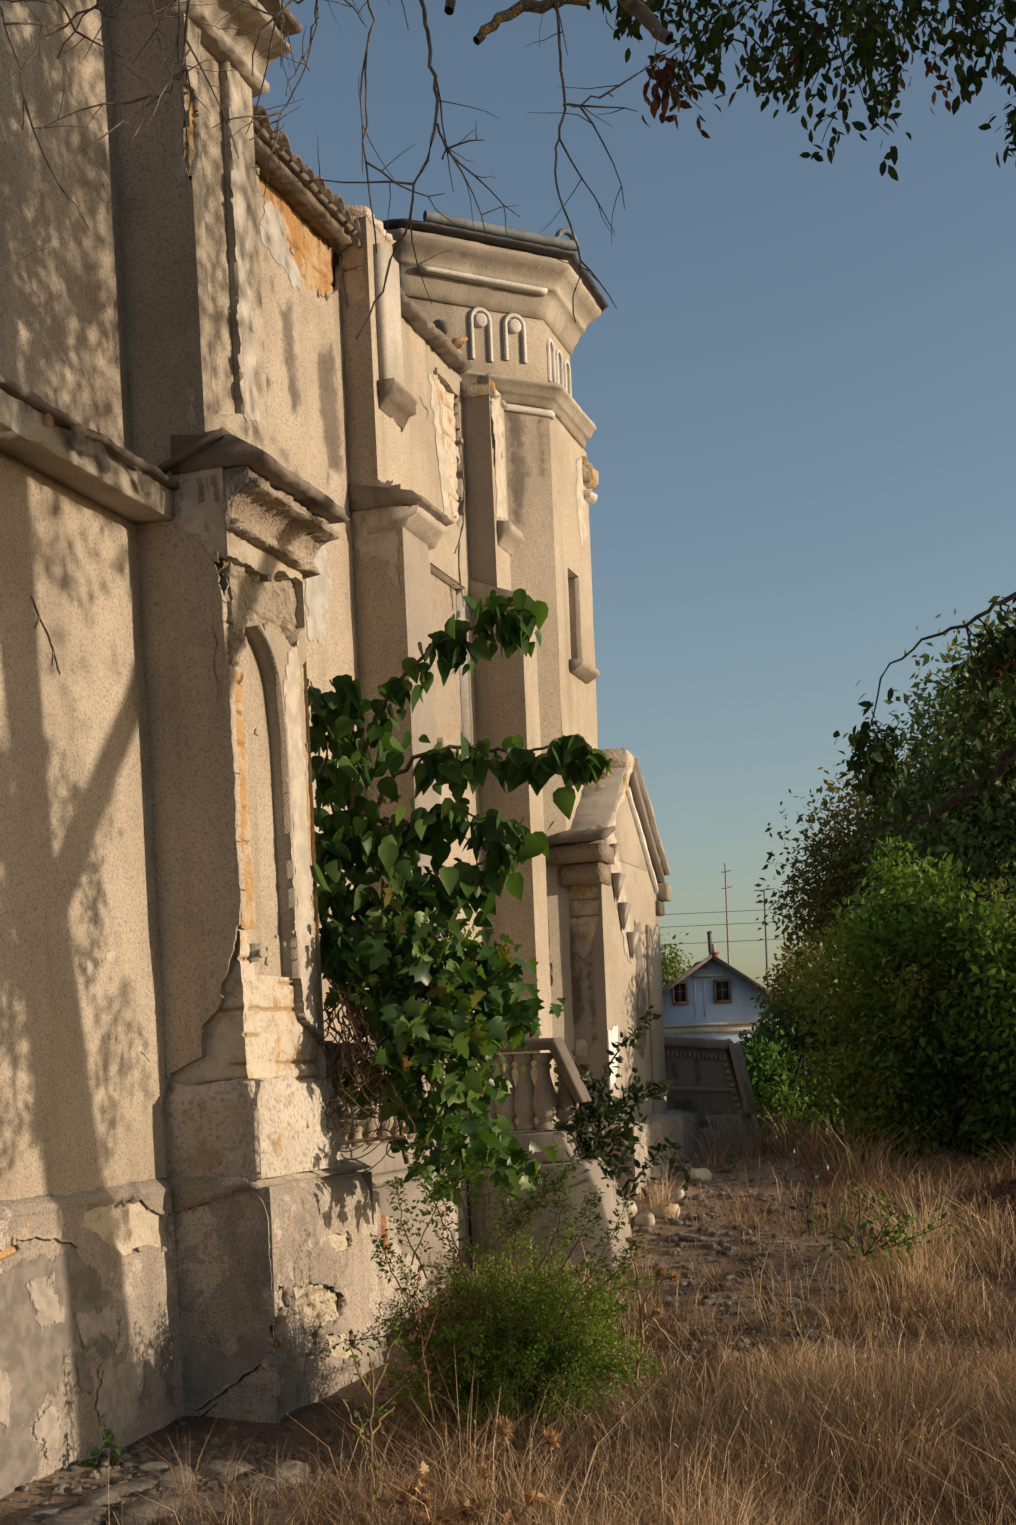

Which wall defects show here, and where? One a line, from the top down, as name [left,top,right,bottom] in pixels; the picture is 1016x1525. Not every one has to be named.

peeling [227,65,368,422]
flaking render [429,367,464,522]
flaking render [165,467,333,1086]
flaking render [569,832,633,964]
flaking render [81,1193,168,1255]
flaking render [328,1232,353,1252]
flaking render [266,1278,361,1364]
crack [194,1362,268,1417]